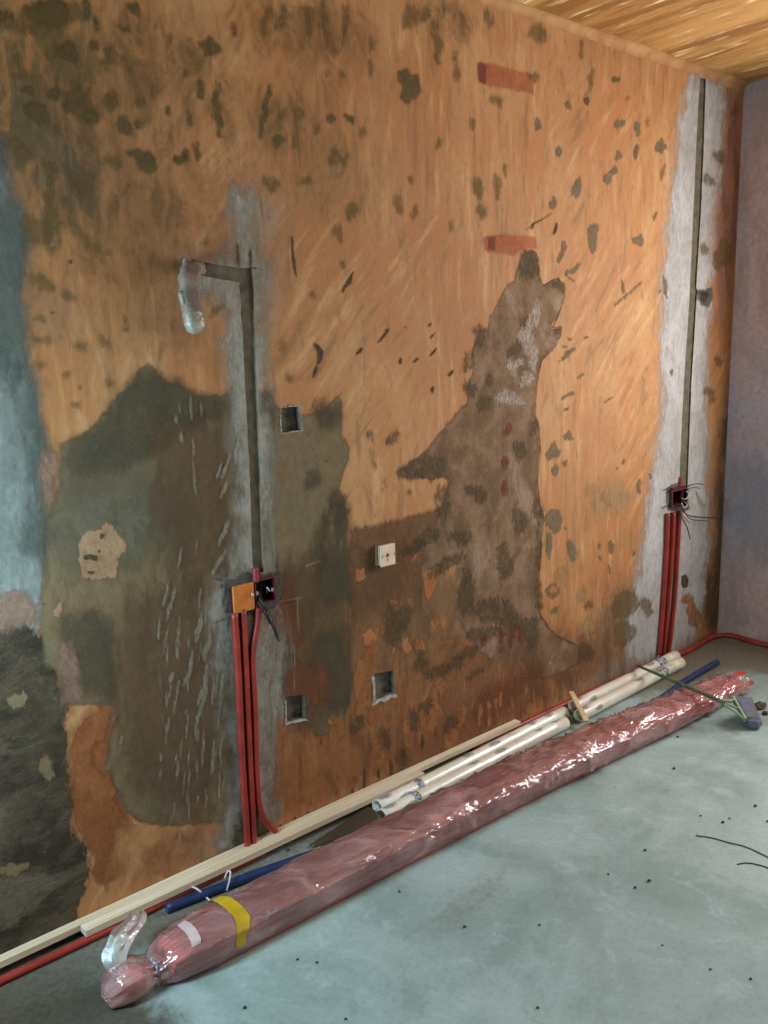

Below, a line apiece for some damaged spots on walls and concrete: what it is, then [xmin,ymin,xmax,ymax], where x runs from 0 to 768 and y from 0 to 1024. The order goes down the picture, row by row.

damp [0,0,119,65]
damp [199,37,222,57]
damp [403,6,442,64]
damp [22,74,141,136]
damp [184,70,224,138]
damp [259,85,295,149]
damp [103,149,157,174]
damp [174,143,202,165]
damp [474,179,486,218]
flaking render [0,140,243,968]
damp [612,591,653,648]
damp [157,584,226,814]